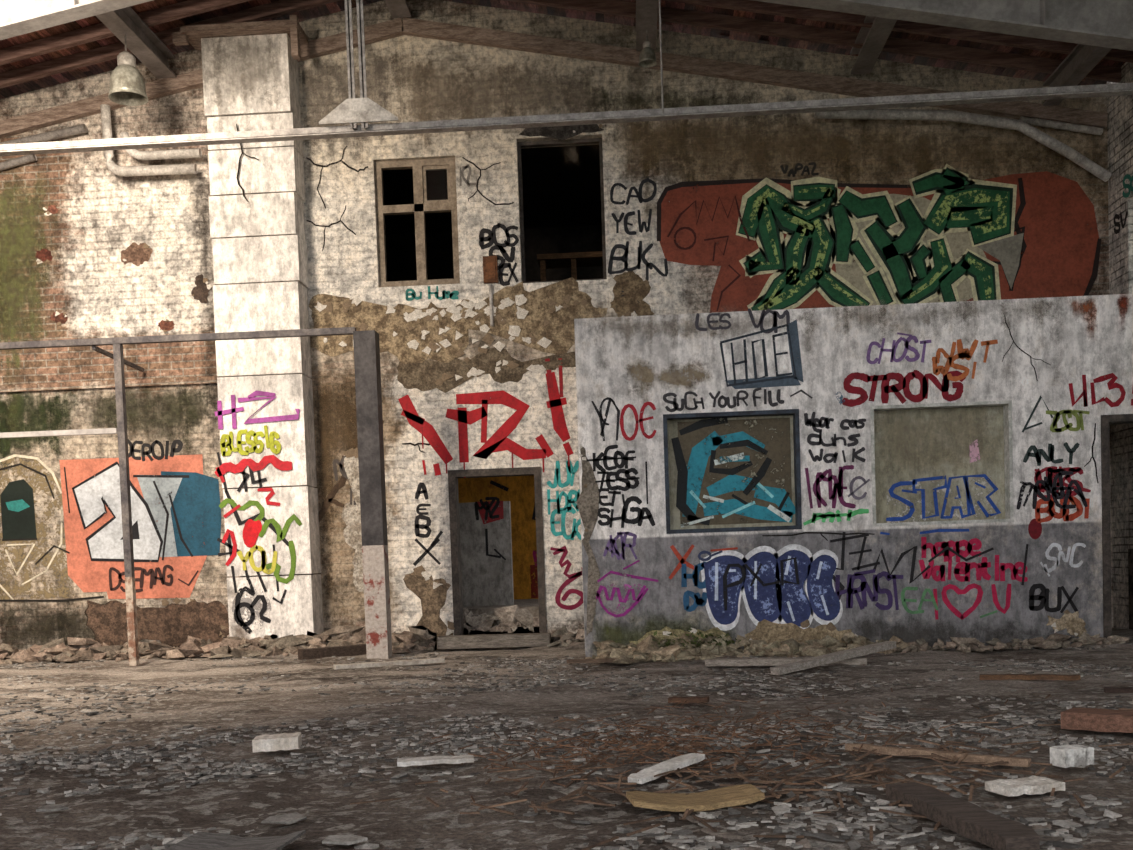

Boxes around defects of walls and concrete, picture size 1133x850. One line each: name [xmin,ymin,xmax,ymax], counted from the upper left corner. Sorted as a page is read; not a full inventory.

flaking render [309,271,654,393]
damp [0,392,16,467]
damp [45,397,59,456]
flaking render [341,447,364,592]